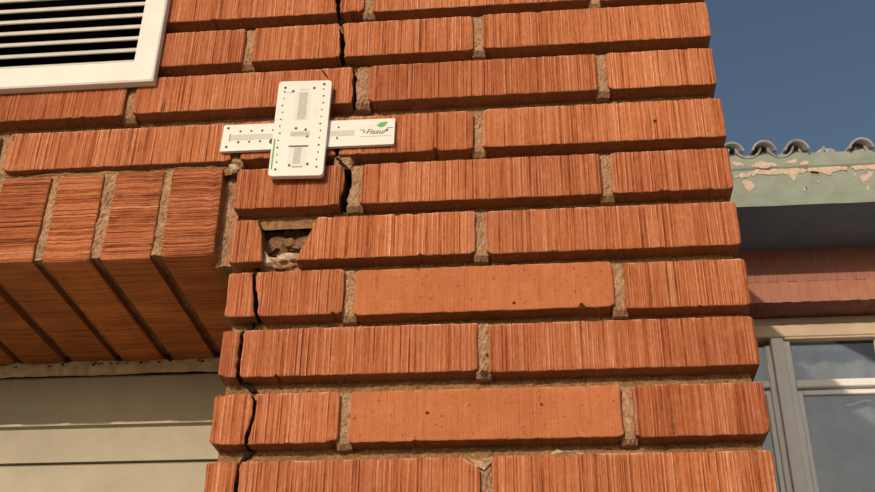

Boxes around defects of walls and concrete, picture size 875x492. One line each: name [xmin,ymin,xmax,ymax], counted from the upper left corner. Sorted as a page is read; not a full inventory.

crack [321,0,358,120]
crack [334,148,352,213]
peeling [731,159,875,192]
spalling [264,230,310,270]
crack [235,268,263,492]